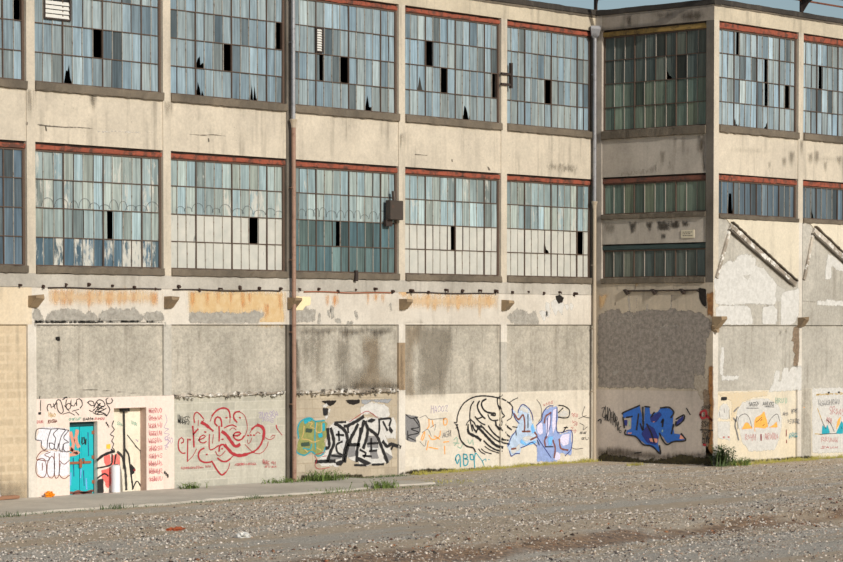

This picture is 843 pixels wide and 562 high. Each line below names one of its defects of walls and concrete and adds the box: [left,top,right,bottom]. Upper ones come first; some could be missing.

corrosion [52,290,156,305]
corrosion [189,291,284,326]
corrosion [400,292,495,308]
peeling [597,254,802,447]